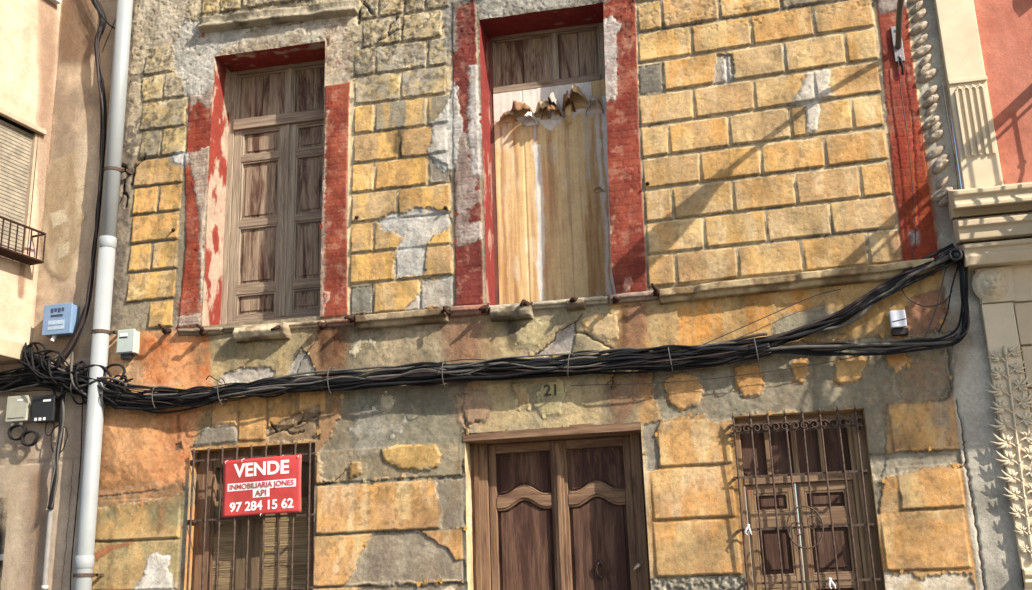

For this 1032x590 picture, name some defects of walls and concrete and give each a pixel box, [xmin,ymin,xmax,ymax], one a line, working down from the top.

crack [359,0,403,45]
flaking render [139,0,327,111]
flaking render [377,65,485,311]
flaking render [514,309,620,358]
flaking render [220,366,275,384]
flaking render [289,347,316,377]
crack [267,413,320,436]
flaking render [651,288,954,514]
flaking render [267,383,492,531]
flaking render [134,552,174,590]
flaking render [345,529,468,590]